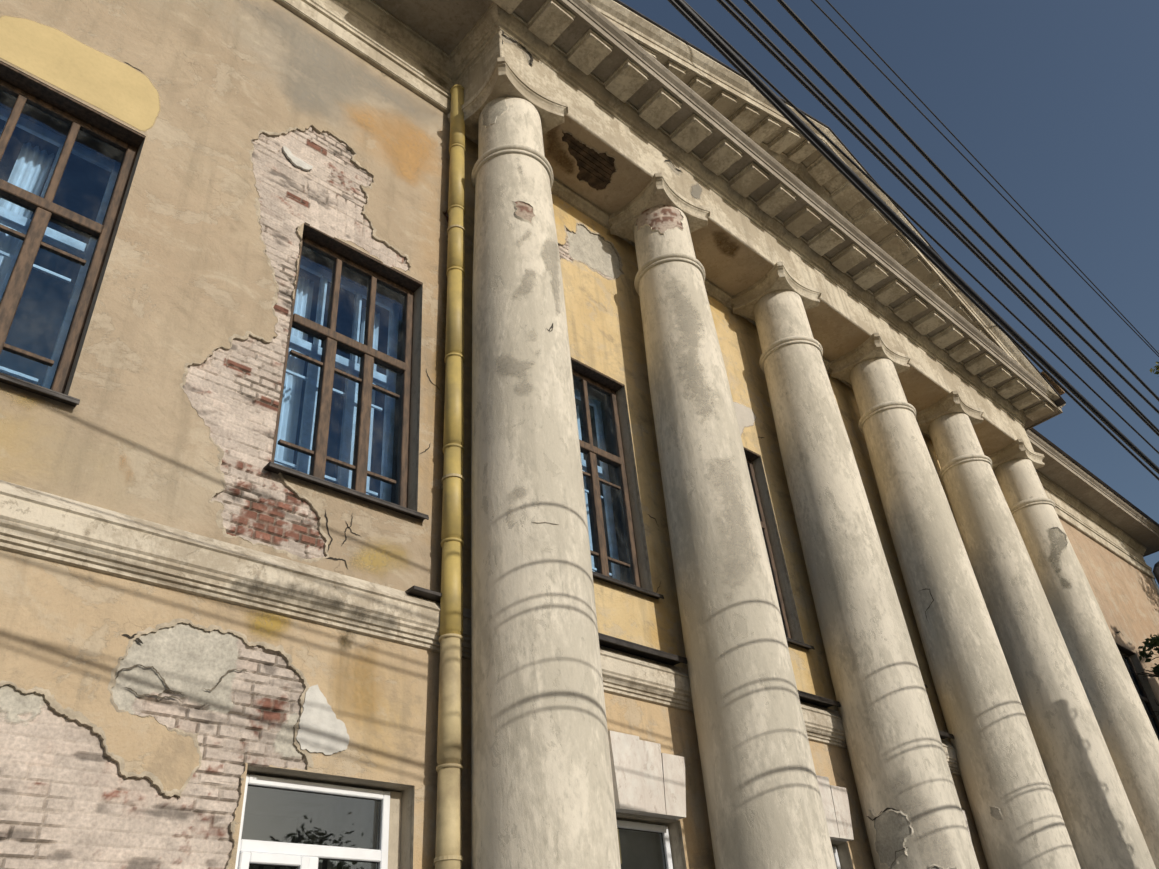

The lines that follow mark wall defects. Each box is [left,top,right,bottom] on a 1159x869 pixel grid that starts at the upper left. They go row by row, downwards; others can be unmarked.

spalling [511,200,536,239]
spalling [635,205,684,235]
spalling [521,222,625,312]
spalling [180,125,411,563]
crack [325,510,360,569]
peeling [1049,527,1071,588]
spalling [0,618,314,869]
spalling [867,807,914,869]